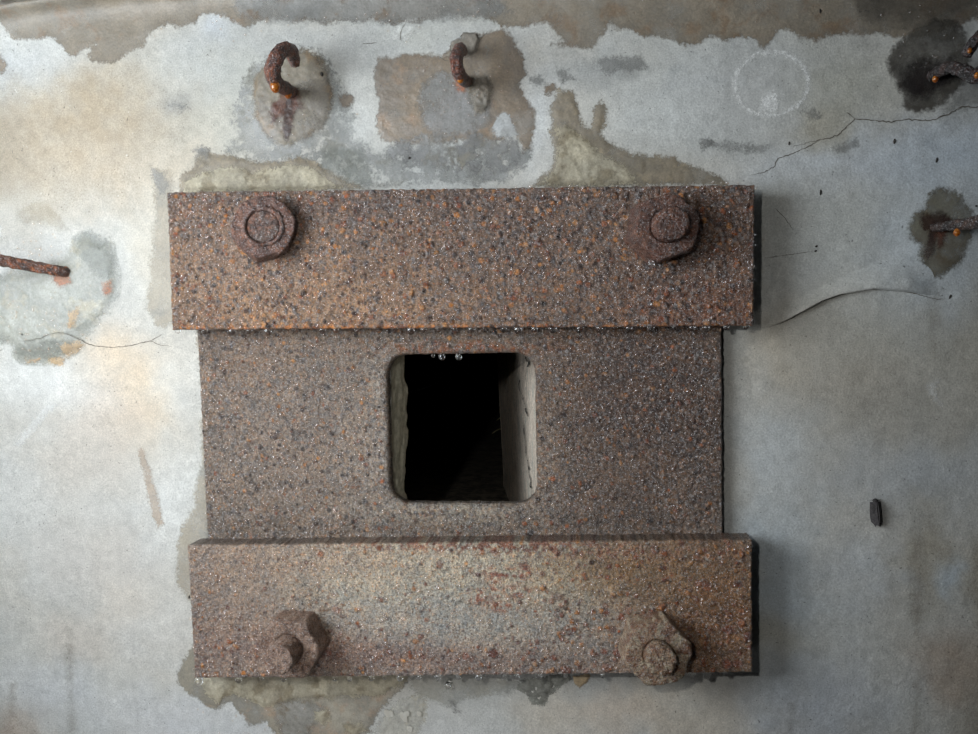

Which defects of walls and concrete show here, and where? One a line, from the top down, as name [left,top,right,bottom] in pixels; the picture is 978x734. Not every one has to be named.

rust [271,91,302,139]
leakage [0,0,978,186]
crack [752,106,978,175]
leakage [910,187,972,277]
crack [26,332,165,348]
flaking render [177,648,428,734]
spalling [517,674,590,706]